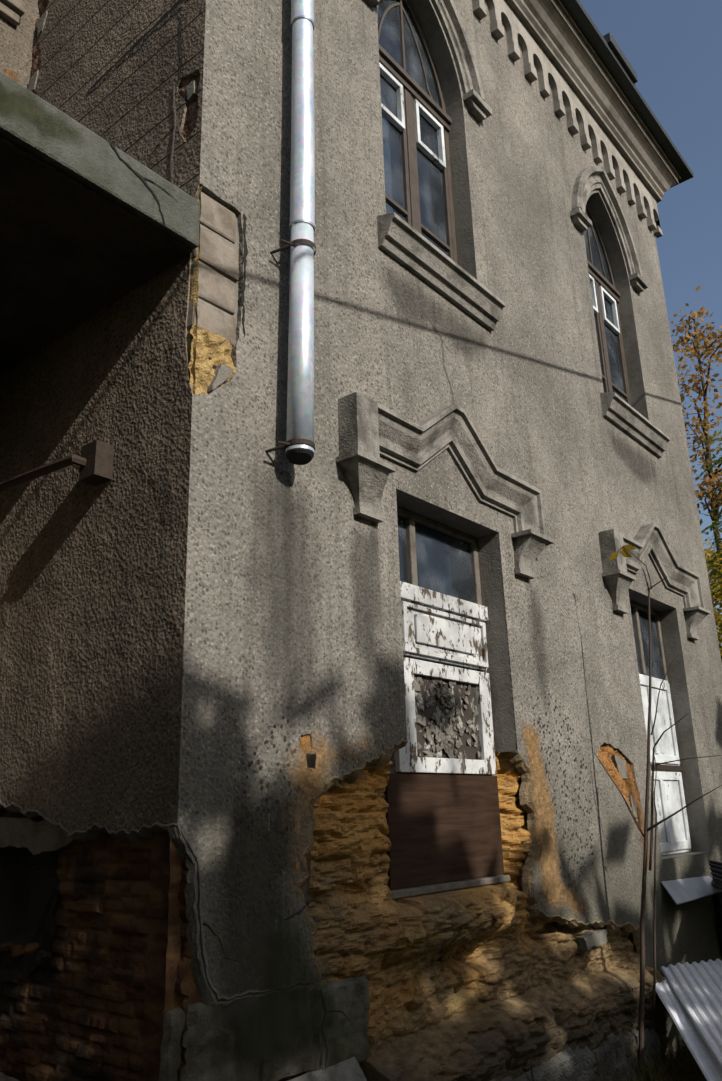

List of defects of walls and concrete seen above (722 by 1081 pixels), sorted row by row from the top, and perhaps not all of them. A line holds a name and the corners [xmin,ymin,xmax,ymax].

crack [87,0,186,223]
spalling [178,74,200,143]
spalling [187,186,248,395]
crack [415,276,454,404]
spalling [243,716,316,813]
spalling [531,693,594,893]
spalling [0,800,250,1081]
spalling [291,739,674,1081]